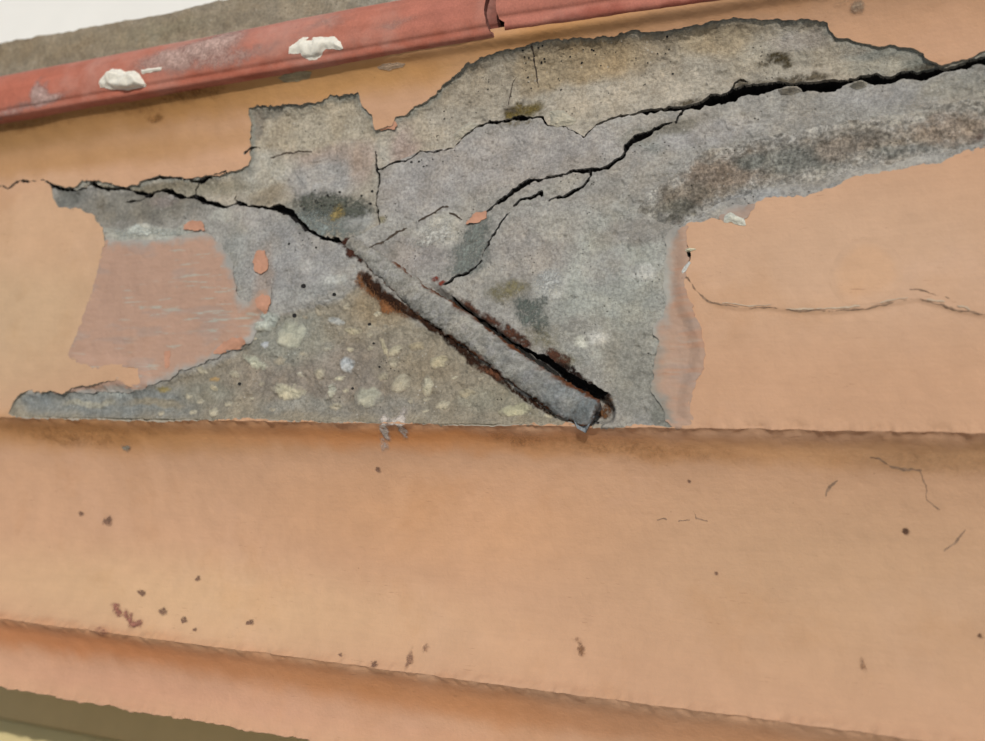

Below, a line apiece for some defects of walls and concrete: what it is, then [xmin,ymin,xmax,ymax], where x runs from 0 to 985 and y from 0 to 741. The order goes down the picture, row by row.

crack [245,147,312,158]
crack [0,172,342,243]
spalling [10,17,985,433]
crack [369,46,985,399]
rust [341,238,554,416]
rust [542,348,593,392]
rust [599,393,614,418]
crack [870,457,940,510]